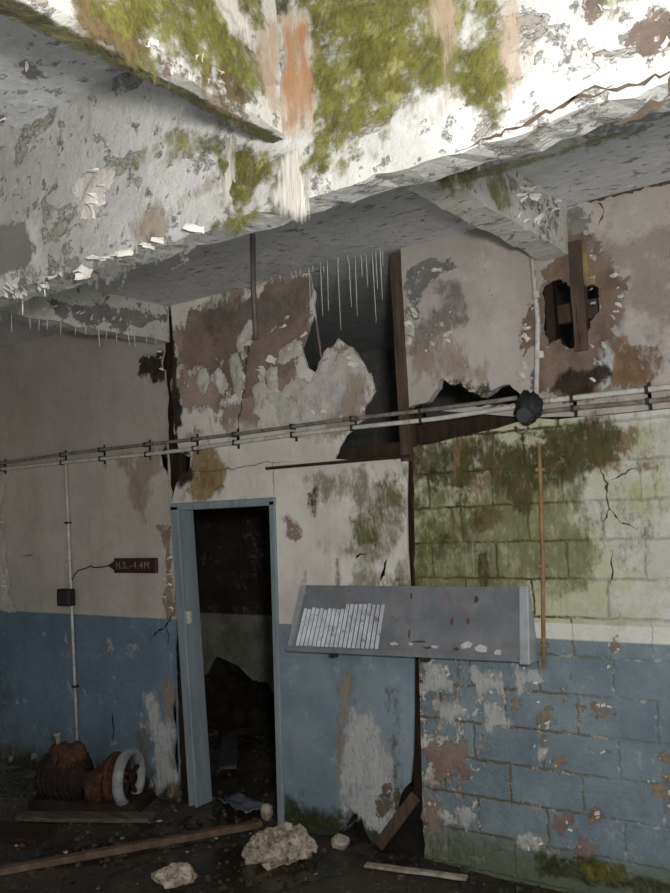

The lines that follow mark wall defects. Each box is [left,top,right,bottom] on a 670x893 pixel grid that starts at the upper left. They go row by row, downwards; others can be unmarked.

damp [219,0,259,63]
rust [256,8,316,135]
crack [456,71,670,152]
peeling [581,0,611,25]
peeling [551,5,670,80]
peeling [0,222,205,334]
flaking render [513,171,631,404]
flaking render [178,273,375,445]
crack [600,468,636,529]
peeling [421,663,472,782]
peeling [467,663,567,775]
peeling [516,831,554,854]